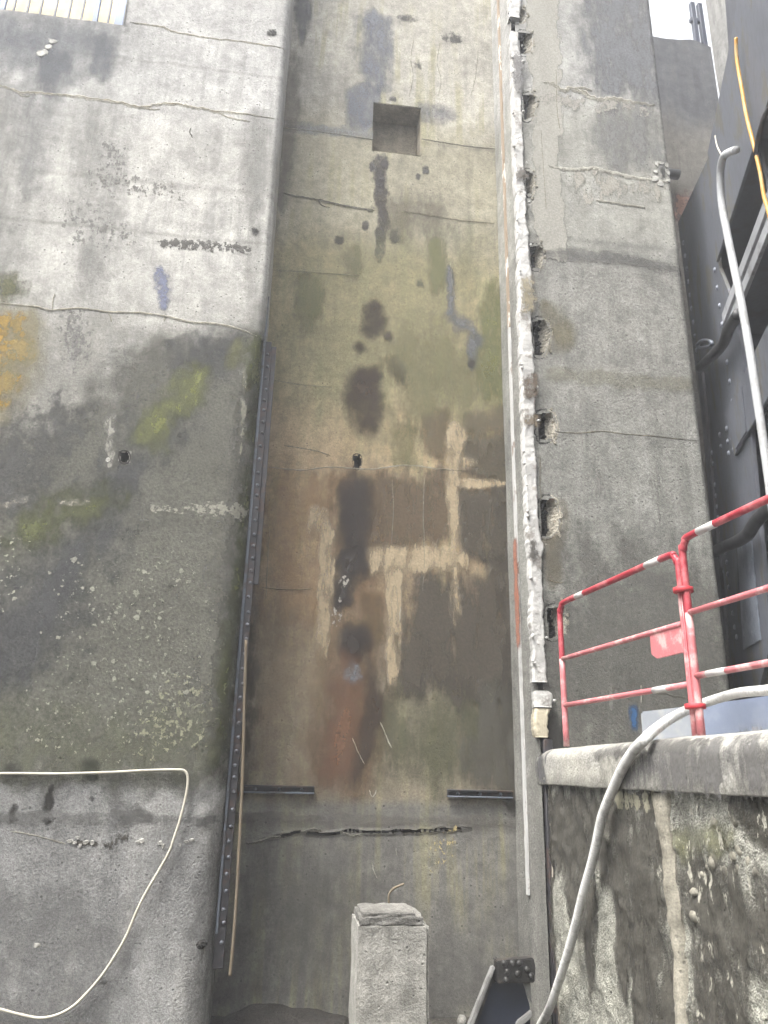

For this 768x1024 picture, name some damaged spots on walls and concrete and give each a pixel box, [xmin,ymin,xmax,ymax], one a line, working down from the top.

crack [0,84,373,140]
spalling [512,89,540,123]
water stain [362,154,400,263]
spalling [519,240,546,272]
crack [0,294,257,336]
spalling [531,316,553,360]
spalling [526,494,563,541]
water stain [0,329,263,825]
water stain [265,405,515,810]
spalling [531,598,570,642]
crack [245,824,472,845]
water stain [613,890,651,1024]